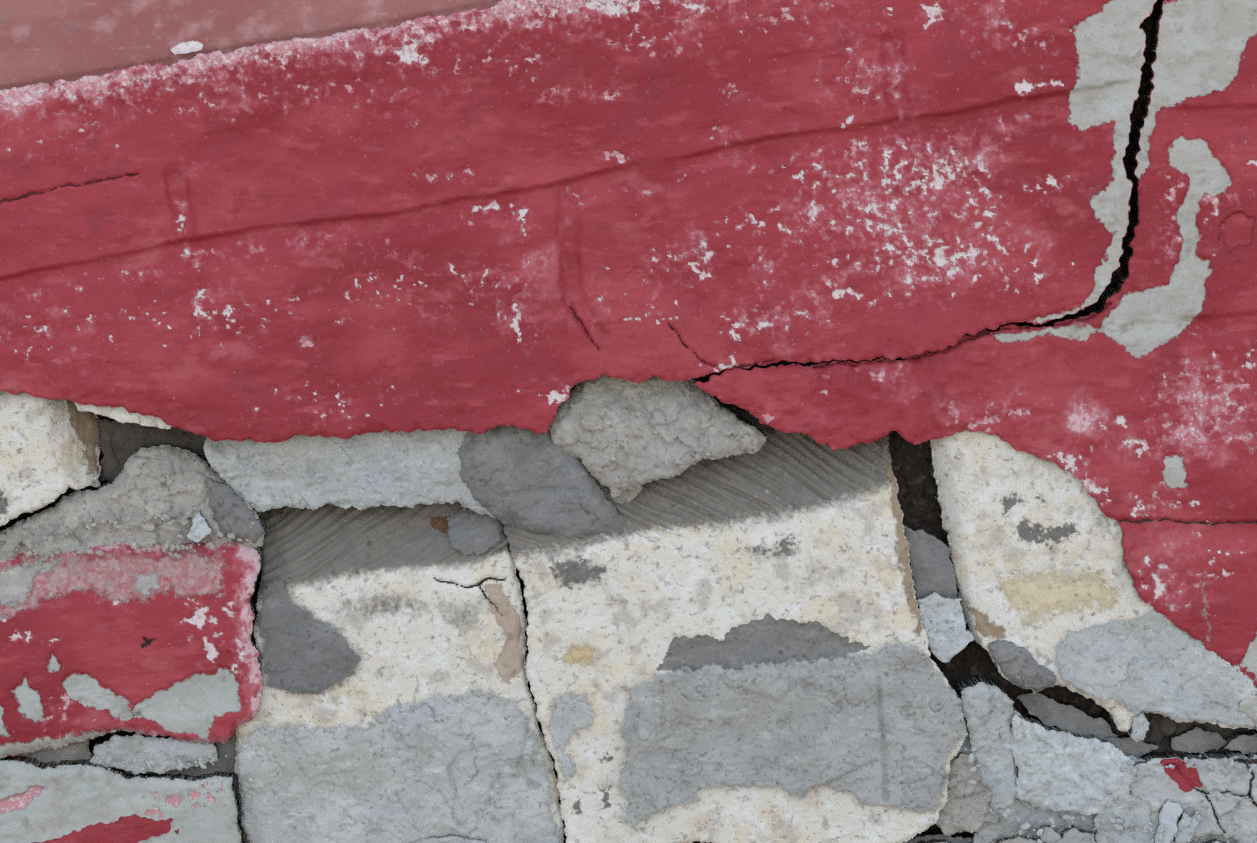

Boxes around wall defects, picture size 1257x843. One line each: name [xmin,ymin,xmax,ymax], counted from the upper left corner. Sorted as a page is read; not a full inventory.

peeling [643,48,1044,306]
crack [668,0,1158,368]
crack [570,306,599,350]
peeling [1130,351,1257,537]
crack [888,430,951,560]
peeling [0,550,246,759]
spalling [657,613,871,674]
spalling [916,591,974,663]
crack [928,623,1109,723]
peeling [32,780,224,843]
peeling [1160,758,1202,792]
crack [1177,758,1257,833]